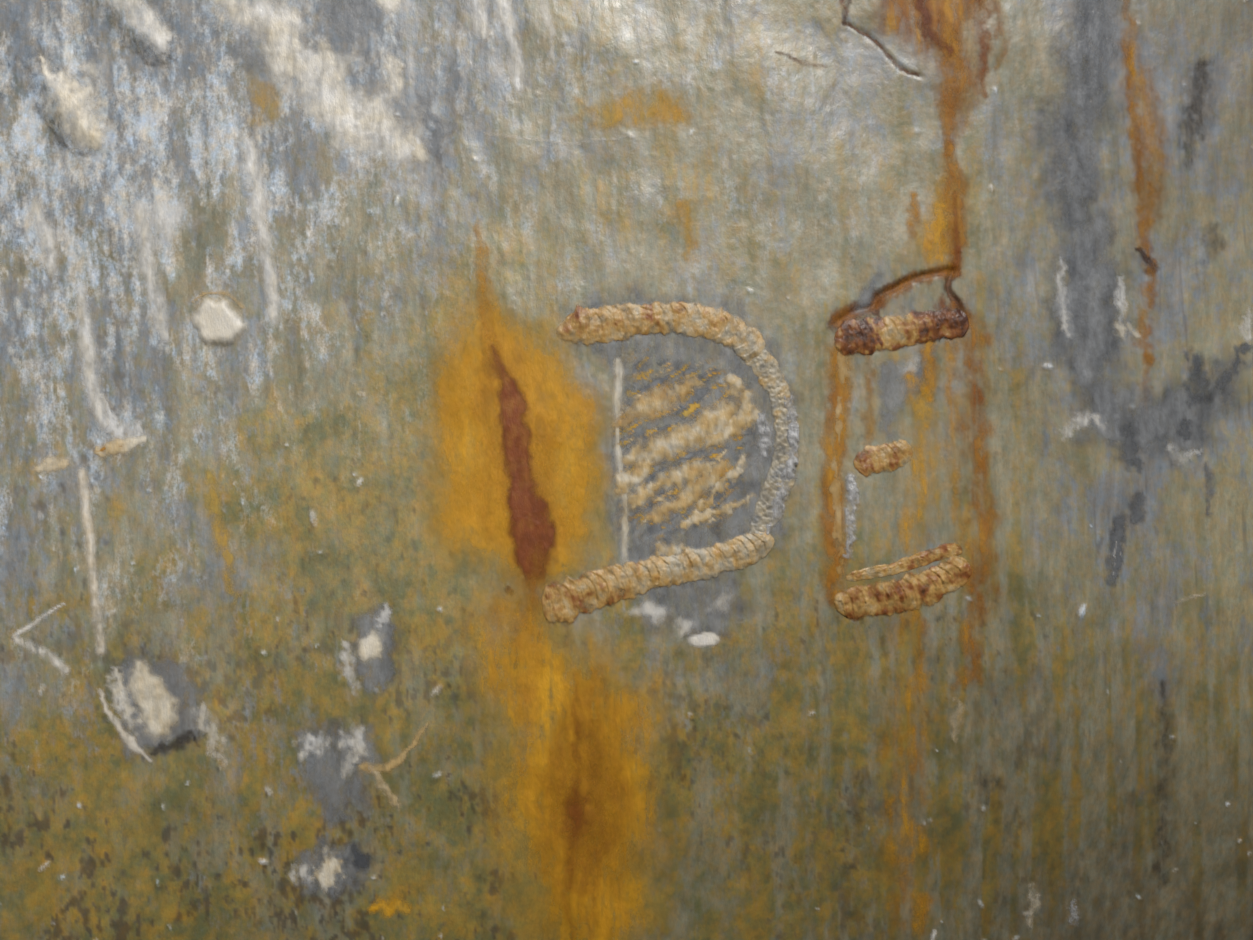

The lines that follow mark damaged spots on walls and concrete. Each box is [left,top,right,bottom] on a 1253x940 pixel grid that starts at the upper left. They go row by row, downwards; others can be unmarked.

rust [884,0,991,276]
rust [1123,46,1157,304]
rust [821,347,850,603]
rust [906,340,951,494]
rust [961,312,990,476]
peeling [99,658,224,761]
peeling [297,724,427,825]
peeling [341,605,395,691]
rust [432,270,659,940]
rust [966,499,996,613]
peeling [290,839,370,897]